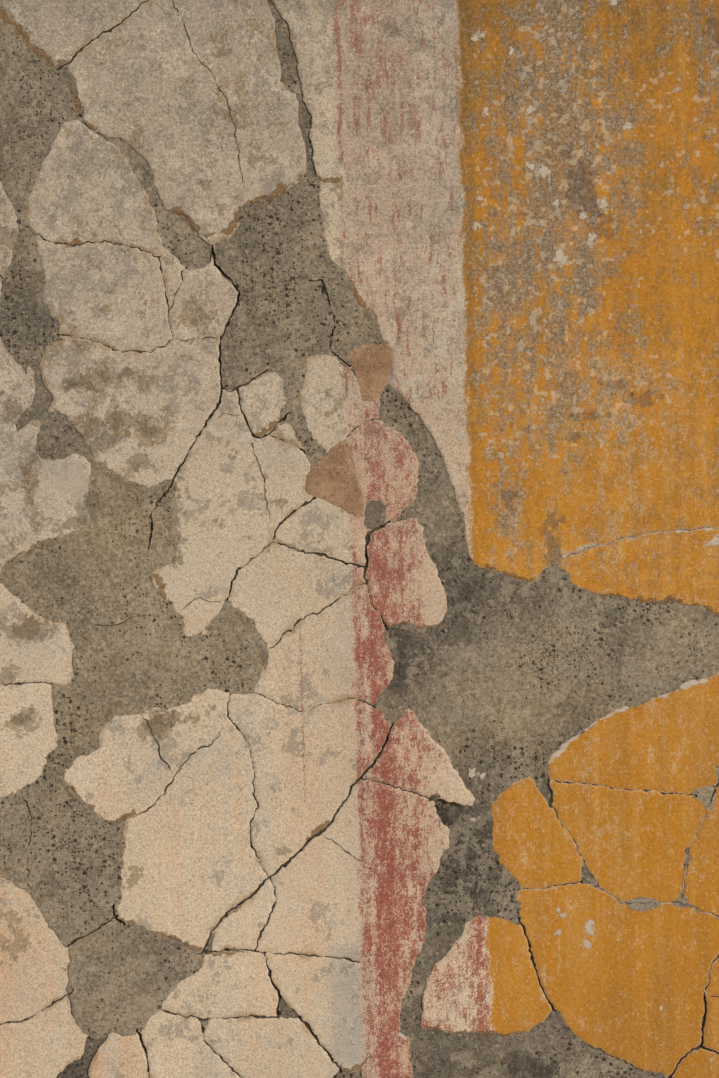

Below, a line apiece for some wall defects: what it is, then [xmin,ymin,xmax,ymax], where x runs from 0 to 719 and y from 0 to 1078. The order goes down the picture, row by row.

crack [57,0,244,184]
crack [33,232,389,648]
spalling [0,0,384,1078]
crack [3,680,52,688]
spalling [373,384,719,1078]
crack [1,786,32,887]
crack [0,990,73,1025]
crack [67,905,125,946]
crack [133,693,431,1078]
crack [518,916,554,1010]
crack [523,780,719,920]
crack [668,954,719,1078]